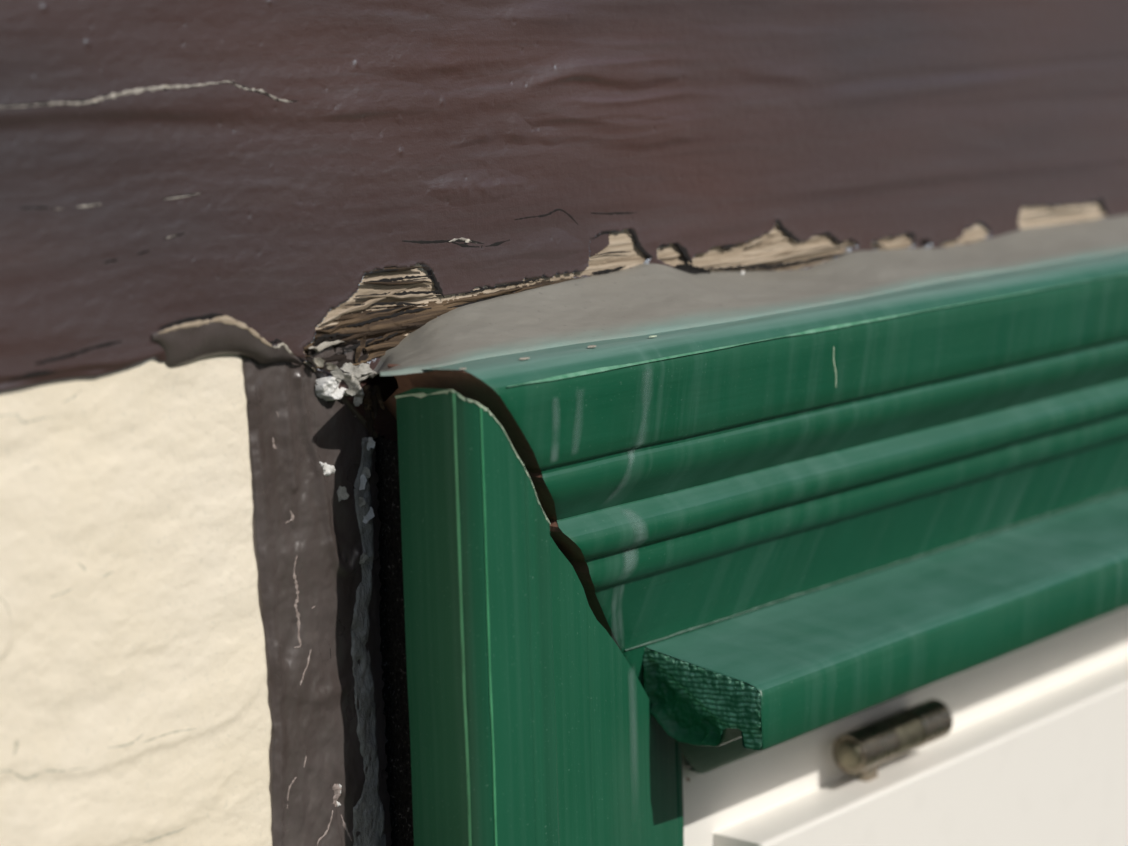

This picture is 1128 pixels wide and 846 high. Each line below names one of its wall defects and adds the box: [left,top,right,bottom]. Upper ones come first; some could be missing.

crack [0,81,297,108]
peeling [1018,198,1107,229]
peeling [941,223,989,247]
peeling [151,219,926,417]